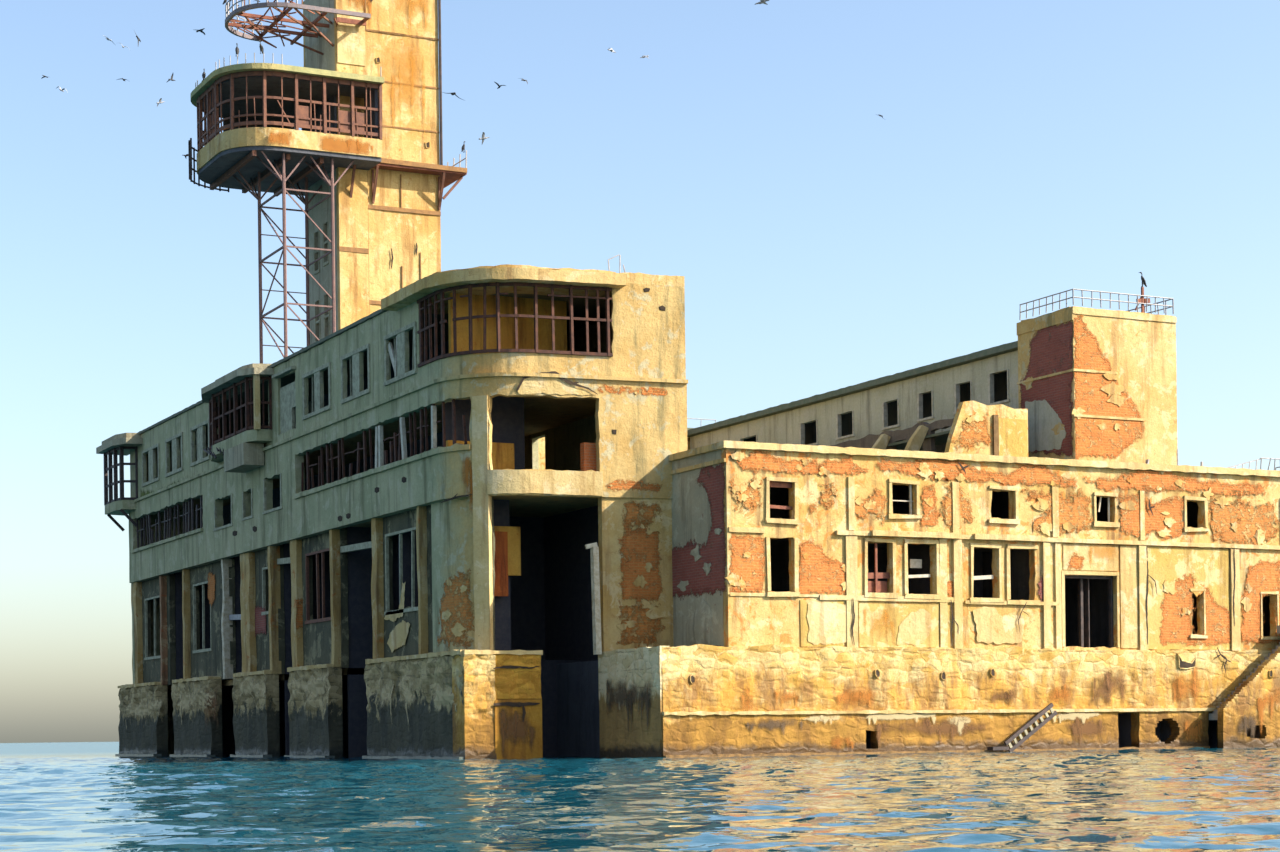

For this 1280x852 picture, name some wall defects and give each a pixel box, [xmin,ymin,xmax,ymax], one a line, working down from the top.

flaking render [607,316,1280,670]
flaking render [437,568,475,651]
leakage [125,700,162,728]
leakage [179,690,214,725]
leakage [381,679,415,722]
leakage [431,687,457,712]
leakage [747,709,840,734]
leakage [866,713,985,746]
leakage [1053,712,1103,744]
leakage [1239,715,1255,737]